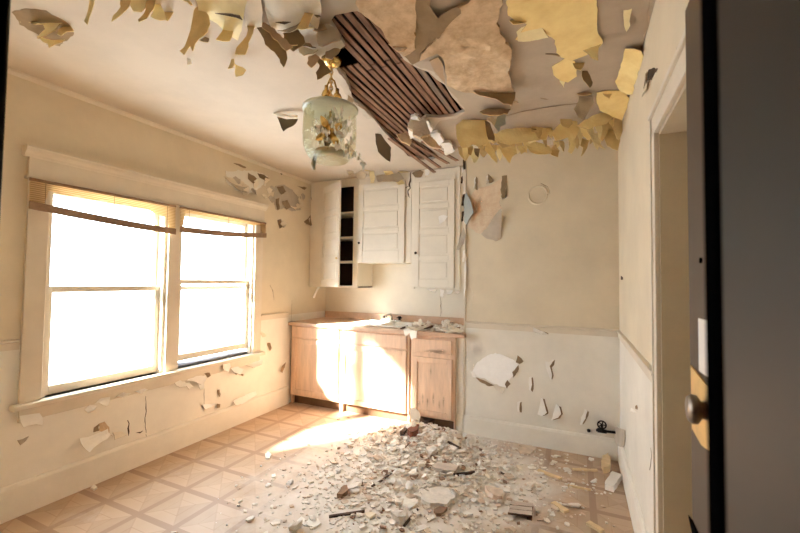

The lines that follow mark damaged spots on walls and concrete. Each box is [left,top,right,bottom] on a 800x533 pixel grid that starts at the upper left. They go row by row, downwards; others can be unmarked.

peeling [112,0,173,22]
peeling [12,8,74,48]
peeling [180,0,263,77]
peeling [273,112,298,131]
peeling [332,0,658,310]
peeling [224,163,312,229]
peeling [174,373,211,390]
spalling [470,353,523,394]
peeling [538,398,563,420]
peeling [17,413,43,445]
peeling [79,422,126,452]